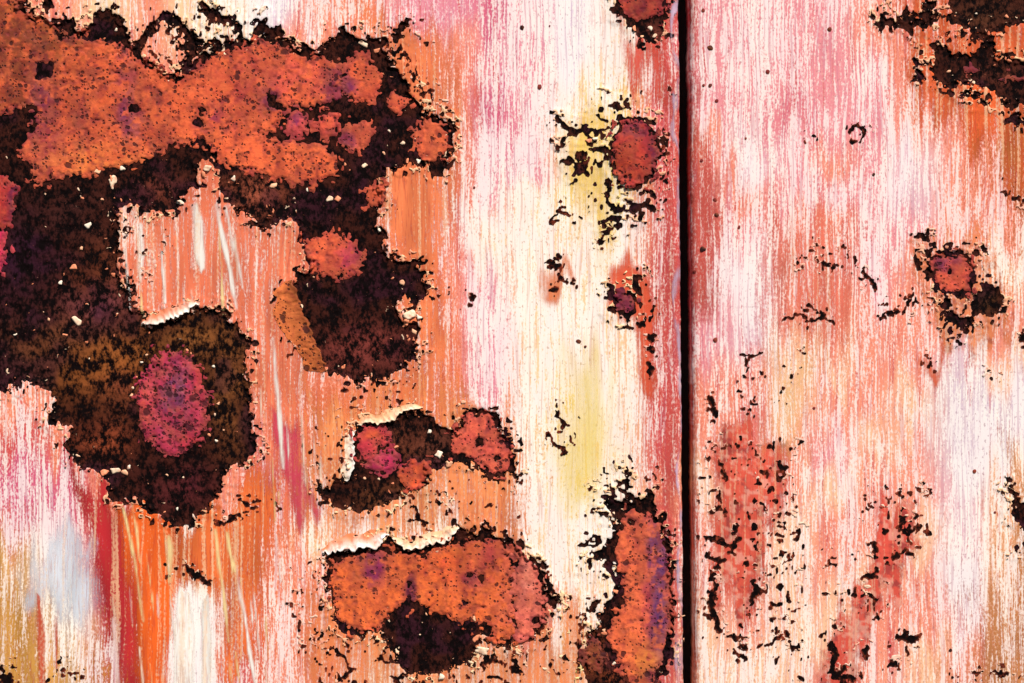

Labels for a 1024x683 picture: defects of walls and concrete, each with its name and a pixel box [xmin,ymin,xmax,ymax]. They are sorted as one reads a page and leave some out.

corrosion [868,0,1024,216]
corrosion [0,0,697,683]
corrosion [691,128,719,323]
corrosion [910,225,1015,387]
corrosion [709,414,789,629]
corrosion [822,493,919,683]